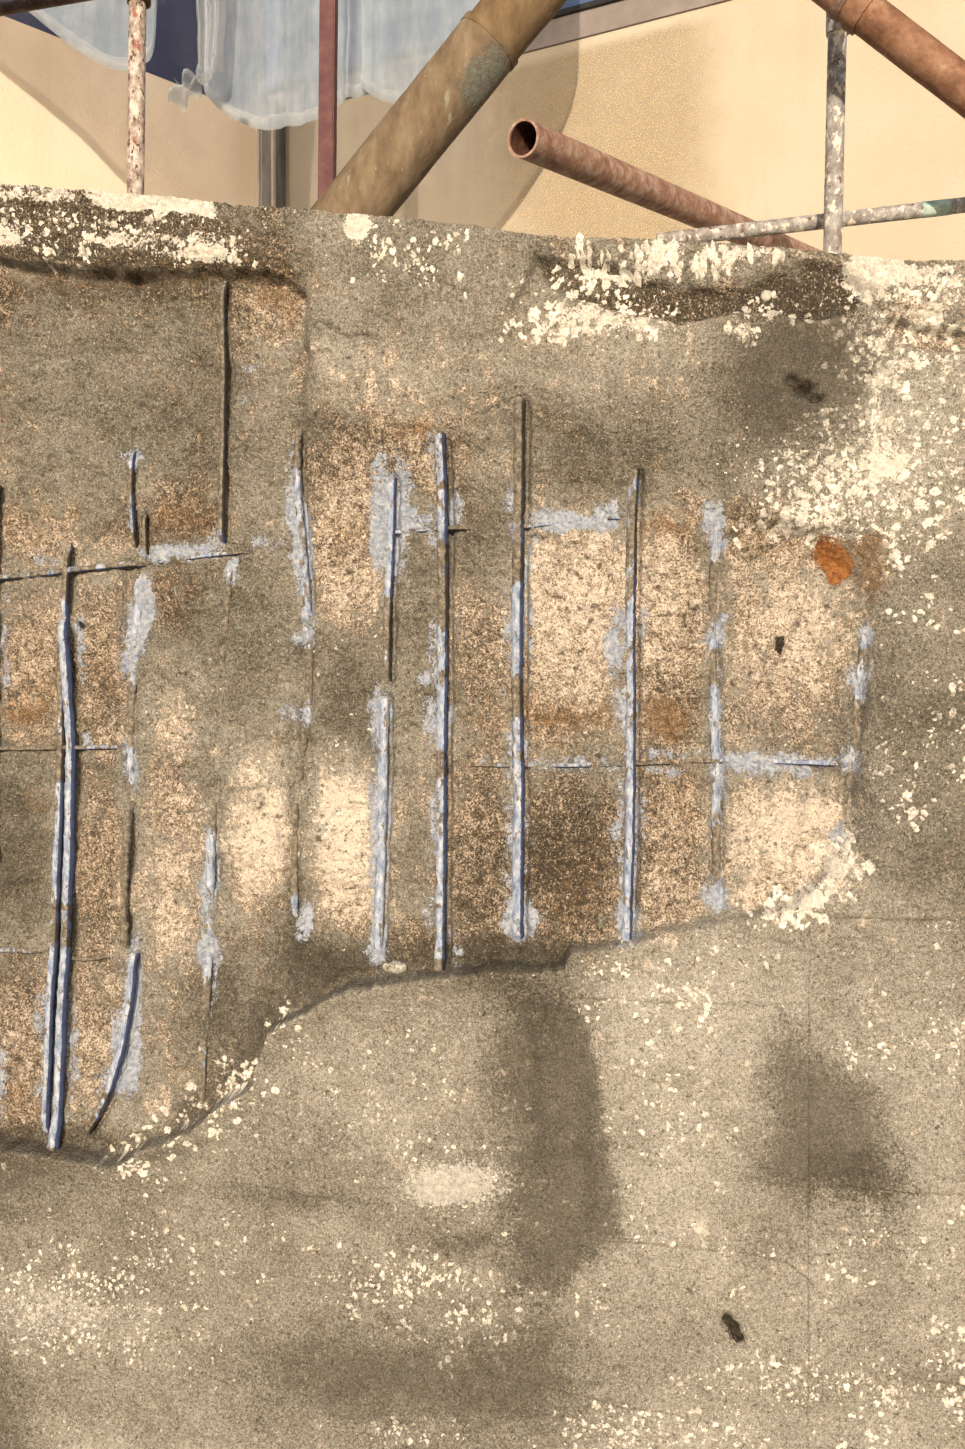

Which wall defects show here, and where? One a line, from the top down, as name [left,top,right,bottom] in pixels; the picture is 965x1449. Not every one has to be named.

spalling [0,184,965,1197]
peeling [0,1211,286,1370]
peeling [591,1184,734,1260]